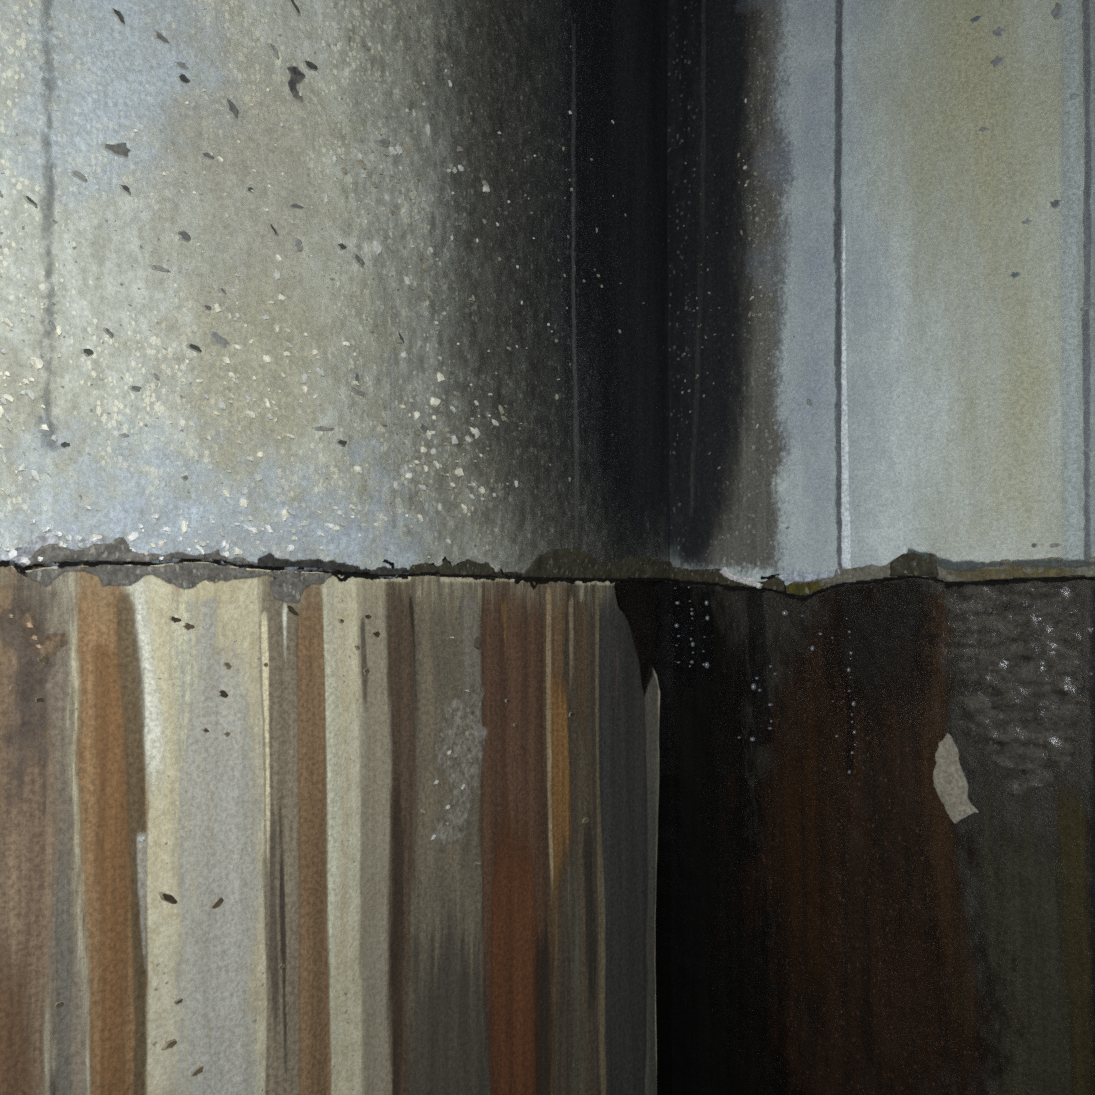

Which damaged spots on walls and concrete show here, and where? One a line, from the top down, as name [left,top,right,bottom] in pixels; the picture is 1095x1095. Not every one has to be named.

water stain [431,0,840,589]
corrosion [0,567,60,1095]
corrosion [77,566,147,1095]
corrosion [297,584,331,1095]
corrosion [387,582,418,1095]
corrosion [481,581,606,1095]
crack [0,537,1095,602]
water stain [598,580,808,1095]
corrosion [743,586,1001,1095]
water stain [834,580,937,726]
peeling [933,733,978,823]
water stain [982,777,1095,1095]